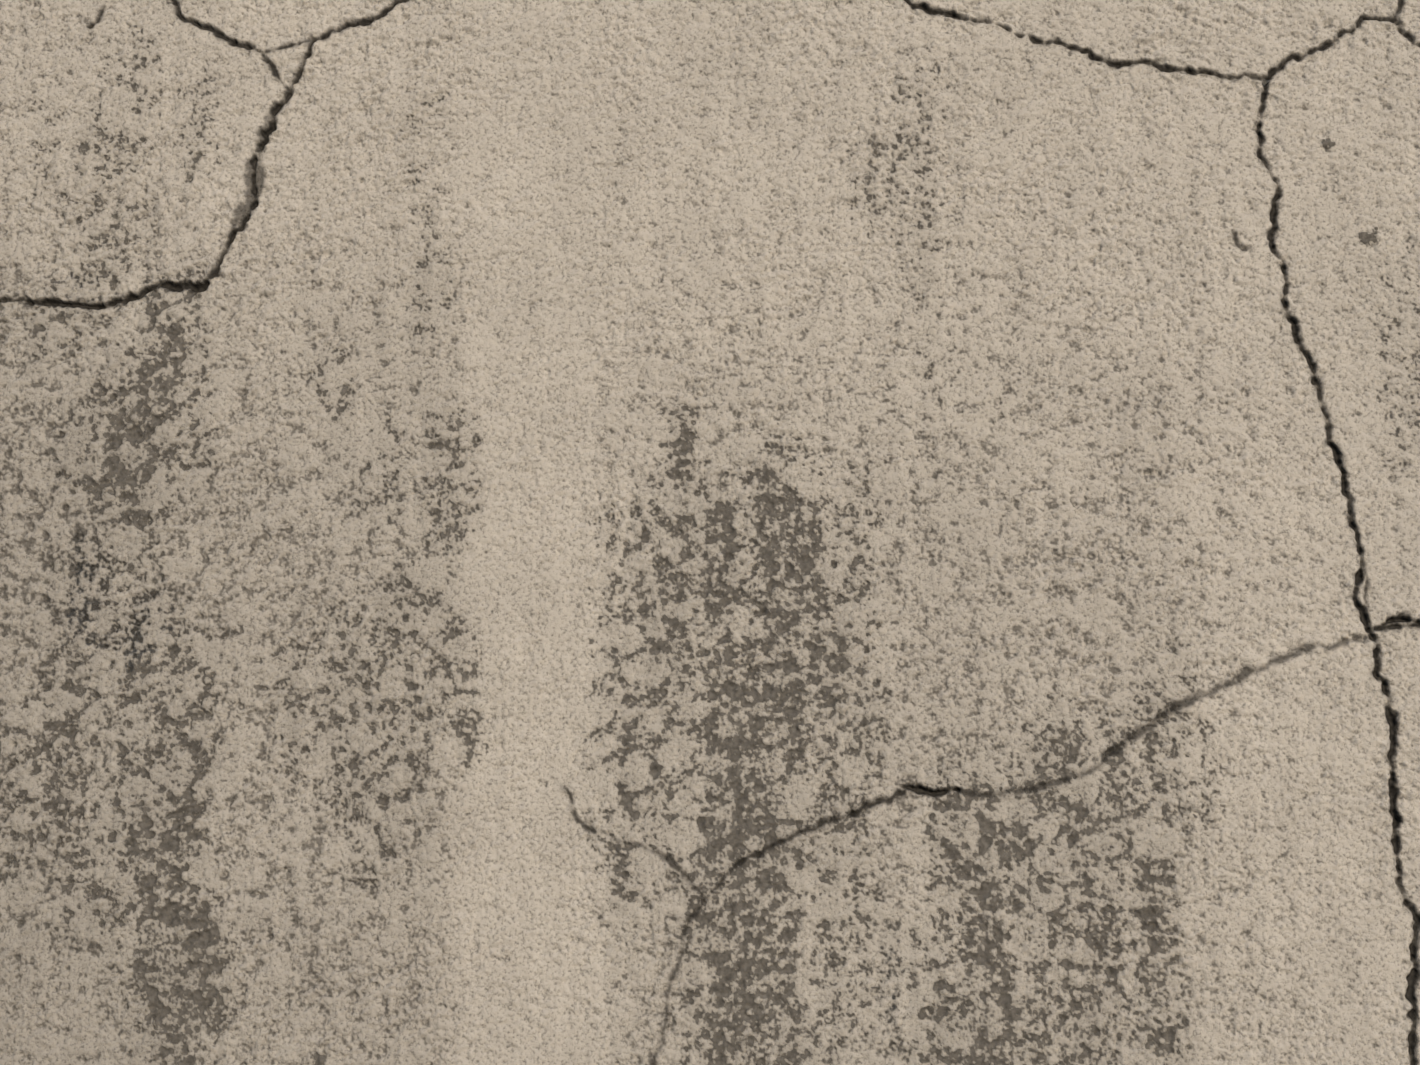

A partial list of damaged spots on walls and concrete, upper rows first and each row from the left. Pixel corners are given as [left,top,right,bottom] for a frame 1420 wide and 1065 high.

damp [116,26,160,114]
damp [178,69,221,182]
crack [0,0,409,310]
damp [0,94,237,1065]
damp [310,350,354,430]
damp [272,408,488,894]
crack [567,790,596,833]
damp [588,404,1219,1065]
crack [650,0,1420,1065]
damp [310,1053,327,1065]